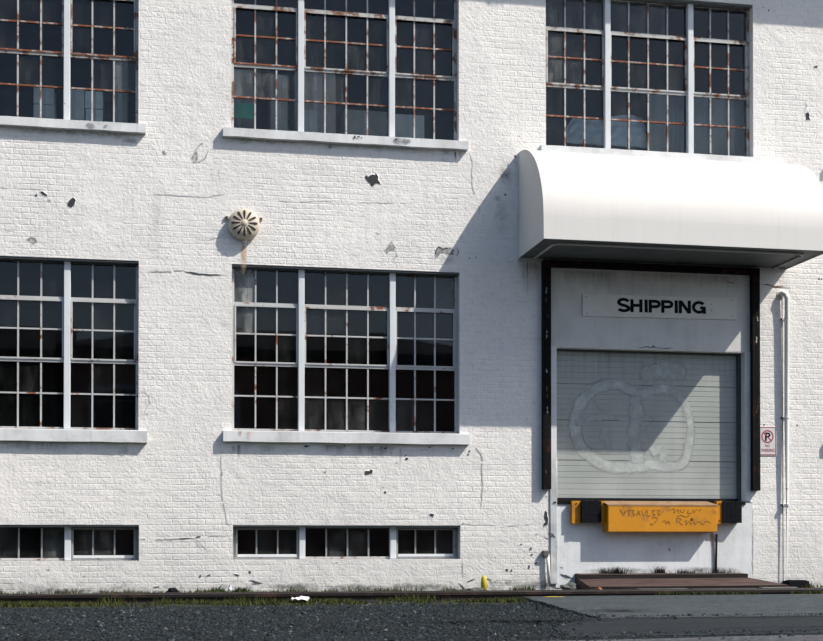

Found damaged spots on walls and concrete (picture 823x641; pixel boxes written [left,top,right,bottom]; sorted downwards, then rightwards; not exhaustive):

spalling [365,173,381,186]
peeling [435,246,459,258]
crack [148,269,231,277]